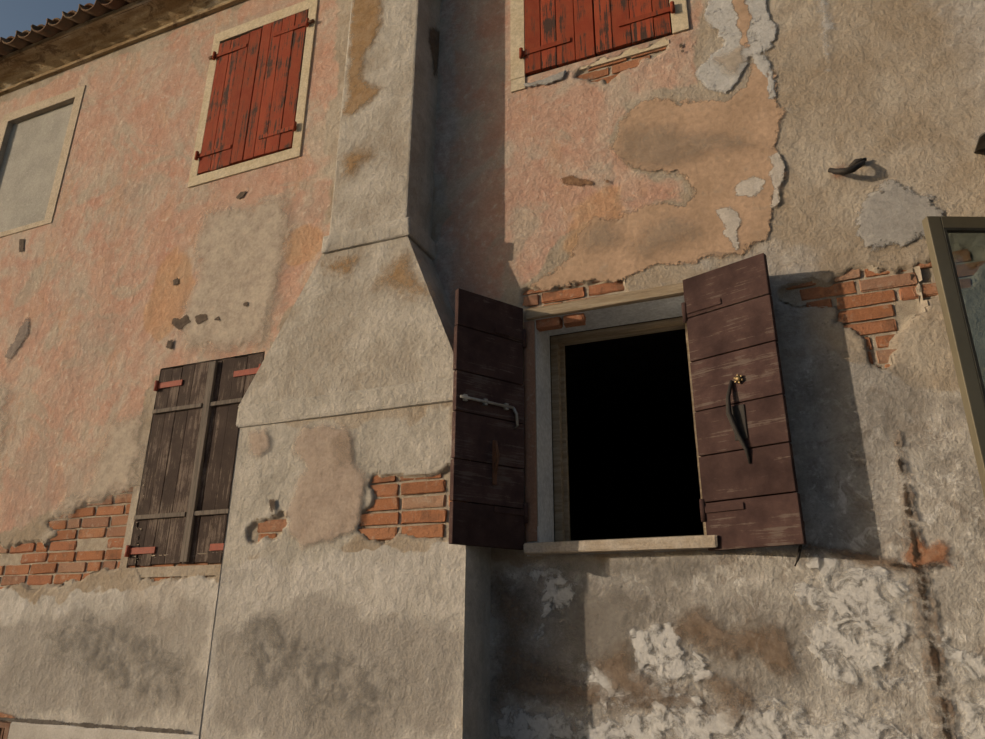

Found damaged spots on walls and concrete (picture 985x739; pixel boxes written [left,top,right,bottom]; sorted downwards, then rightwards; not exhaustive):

peeling [522,0,786,308]
flaking render [536,313,586,332]
flaking render [778,259,938,369]
flaking render [951,243,985,289]
flaking render [0,415,223,591]
peeling [247,425,451,545]
leakage [527,560,578,646]
leakage [495,622,920,739]
leakage [794,553,909,699]
crack [890,430,957,739]
leakage [932,637,985,684]
leakage [958,693,985,739]